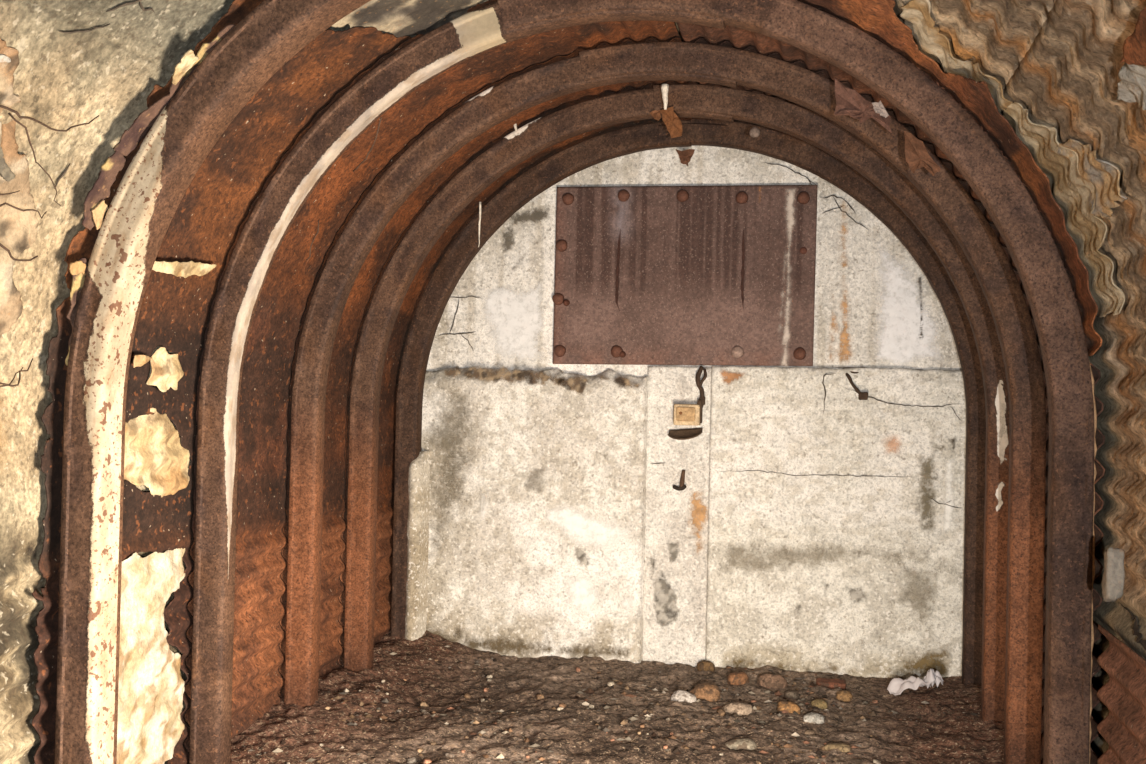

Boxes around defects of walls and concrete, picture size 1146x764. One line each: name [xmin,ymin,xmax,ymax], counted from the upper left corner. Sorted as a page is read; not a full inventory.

crack [54,163,71,189]
peeling [83,106,190,764]
water stain [437,414,464,525]
water stain [527,472,541,491]
water stain [546,507,626,547]
rust [691,494,707,548]